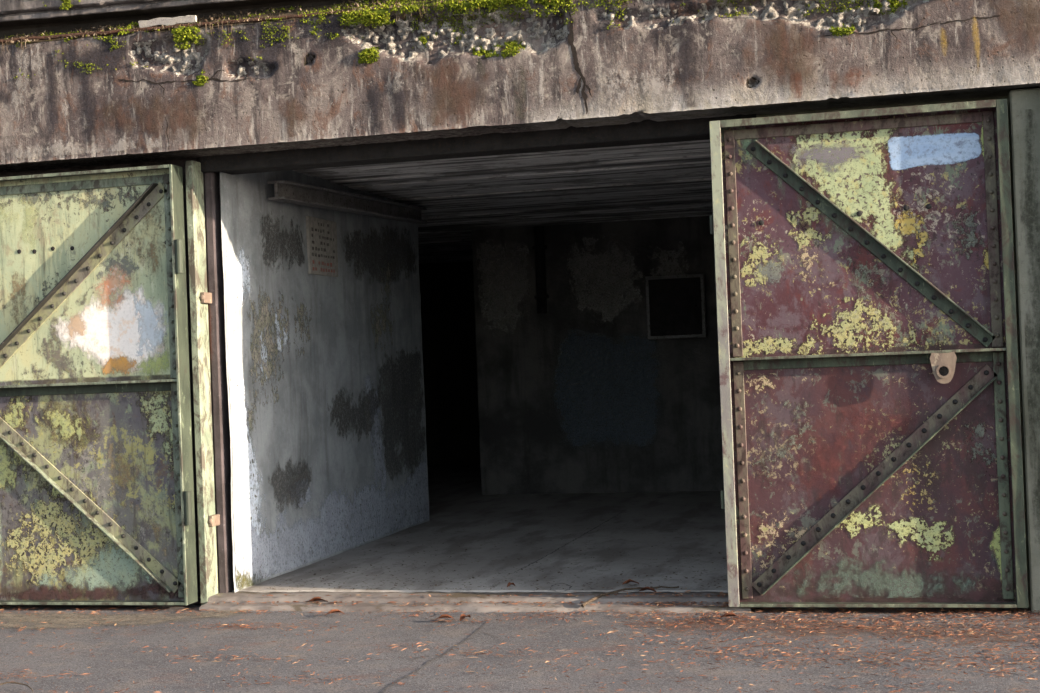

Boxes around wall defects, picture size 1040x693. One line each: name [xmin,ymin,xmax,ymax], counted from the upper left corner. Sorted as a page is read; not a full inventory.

leakage [0,40,199,158]
leakage [236,23,285,76]
leakage [372,59,476,130]
crack [567,13,592,114]
leakage [599,21,697,107]
peeling [772,116,931,273]
peeling [735,204,949,358]
peeling [22,309,85,382]
peeling [1,396,100,460]
peeling [0,440,128,586]
peeling [751,510,812,573]
peeling [838,464,954,560]